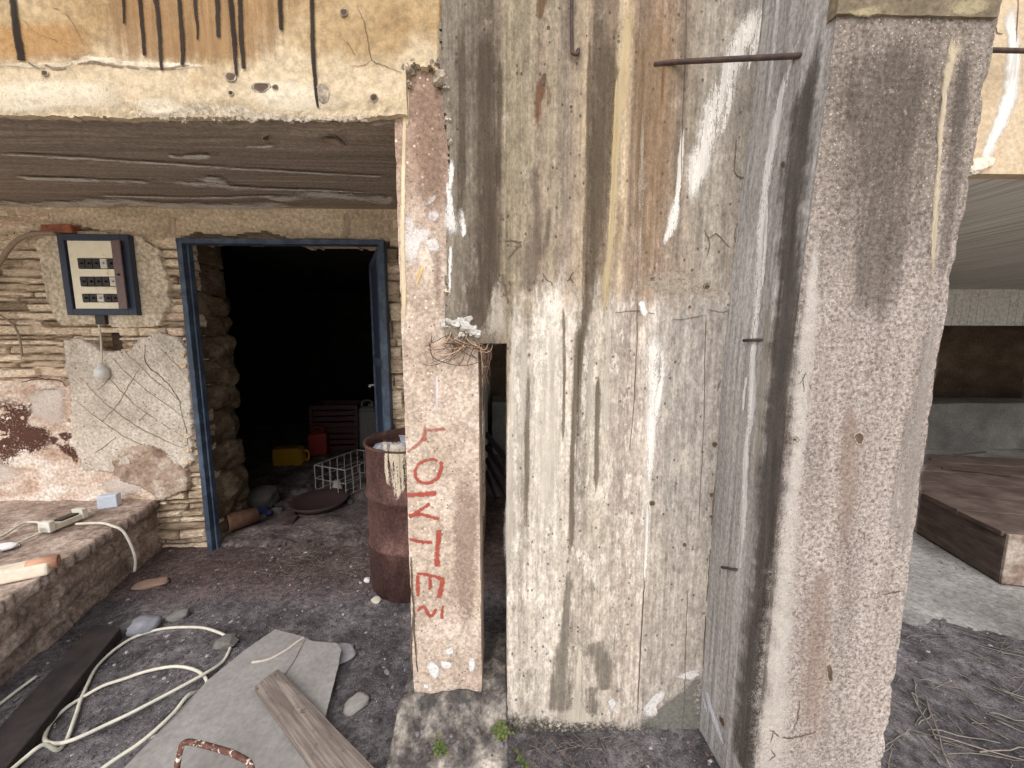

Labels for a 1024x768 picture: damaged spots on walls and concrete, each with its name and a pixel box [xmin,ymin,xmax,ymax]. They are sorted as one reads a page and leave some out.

water stain [0,26,78,57]
water stain [113,0,278,58]
water stain [404,42,502,326]
peeling [0,387,78,483]
crack [144,345,188,446]
water stain [507,5,819,768]
peeling [102,472,142,496]